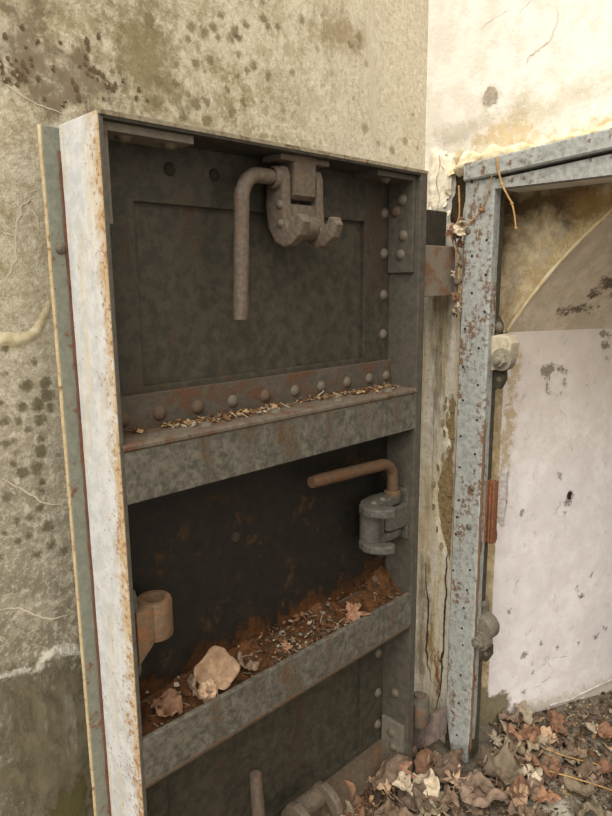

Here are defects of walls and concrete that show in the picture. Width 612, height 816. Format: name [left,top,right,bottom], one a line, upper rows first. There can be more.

damp [0,0,114,119]
crack [527,11,559,62]
peeling [557,276,612,316]
peeling [541,363,567,393]
peeling [432,396,456,560]
rust [474,421,499,637]
crack [425,546,448,709]